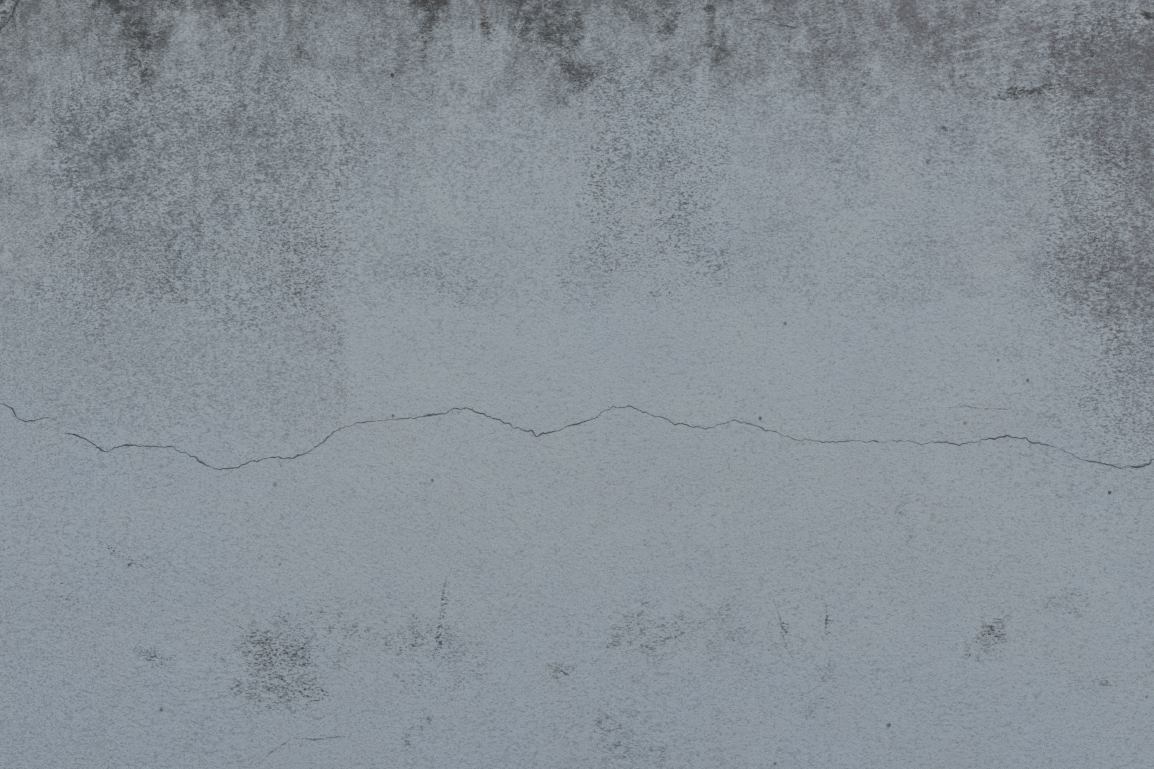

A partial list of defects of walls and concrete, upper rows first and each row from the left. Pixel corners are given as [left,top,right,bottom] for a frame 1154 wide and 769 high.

water stain [512,0,597,103]
water stain [59,0,173,212]
water stain [999,21,1154,317]
crack [68,421,371,470]
crack [404,405,725,437]
crack [1086,459,1154,469]